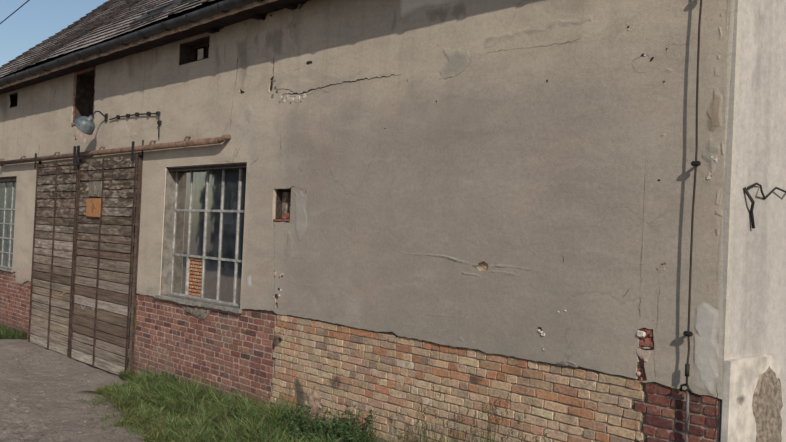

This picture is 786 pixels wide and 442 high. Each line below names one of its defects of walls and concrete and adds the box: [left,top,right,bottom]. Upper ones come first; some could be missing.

crack [278,74,401,102]
spalling [635,328,654,383]